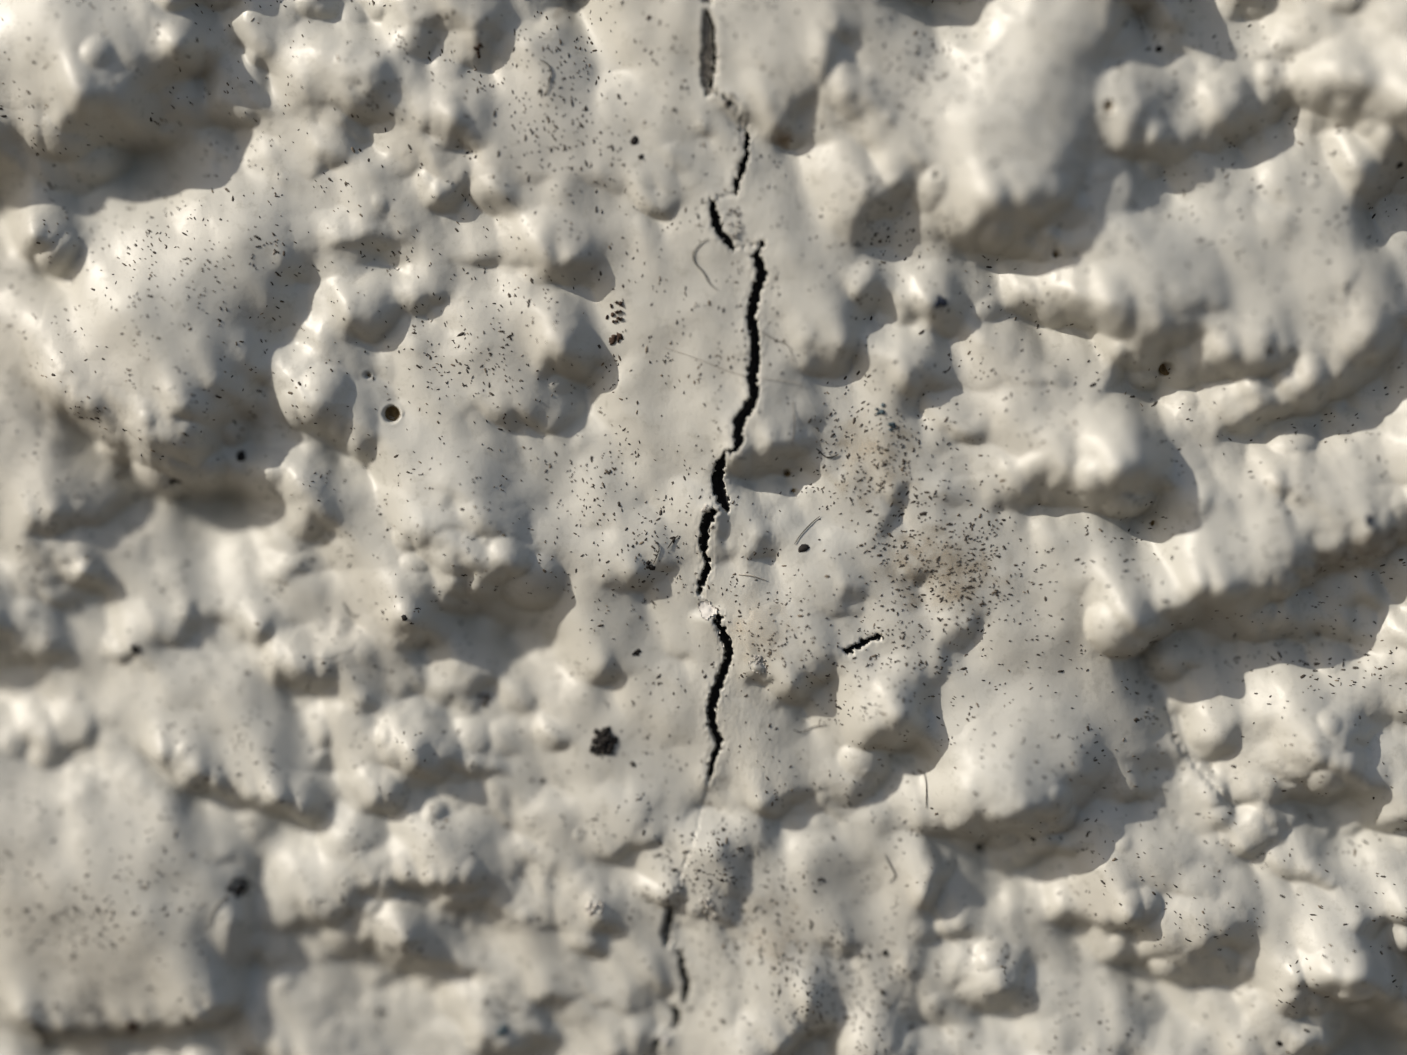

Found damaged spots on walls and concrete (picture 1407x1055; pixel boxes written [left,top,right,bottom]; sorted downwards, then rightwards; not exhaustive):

crack [698,0,733,106]
crack [697,137,768,778]
crack [652,905,691,1049]